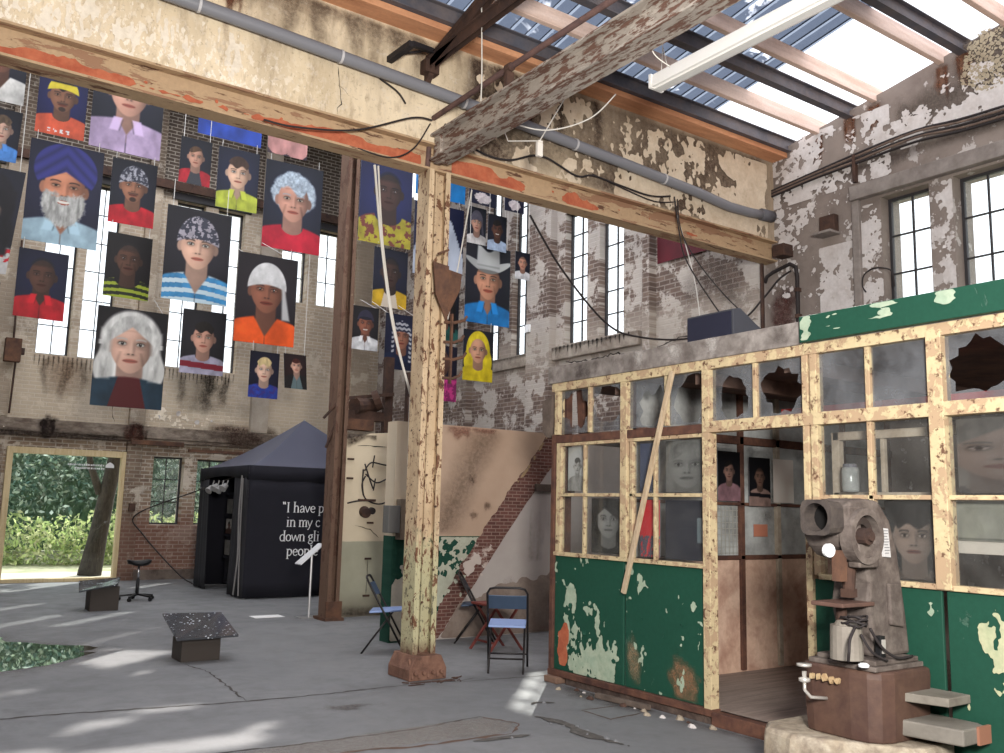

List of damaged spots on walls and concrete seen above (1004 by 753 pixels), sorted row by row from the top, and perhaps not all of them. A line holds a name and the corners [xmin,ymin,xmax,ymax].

peeling [476,74,503,102]
peeling [539,96,593,143]
peeling [452,135,537,192]
peeling [552,61,1004,329]
peeling [800,316,811,340]
flaking render [436,434,554,638]
peeling [555,561,619,683]
rust [672,663,697,700]
peeling [977,610,1004,696]